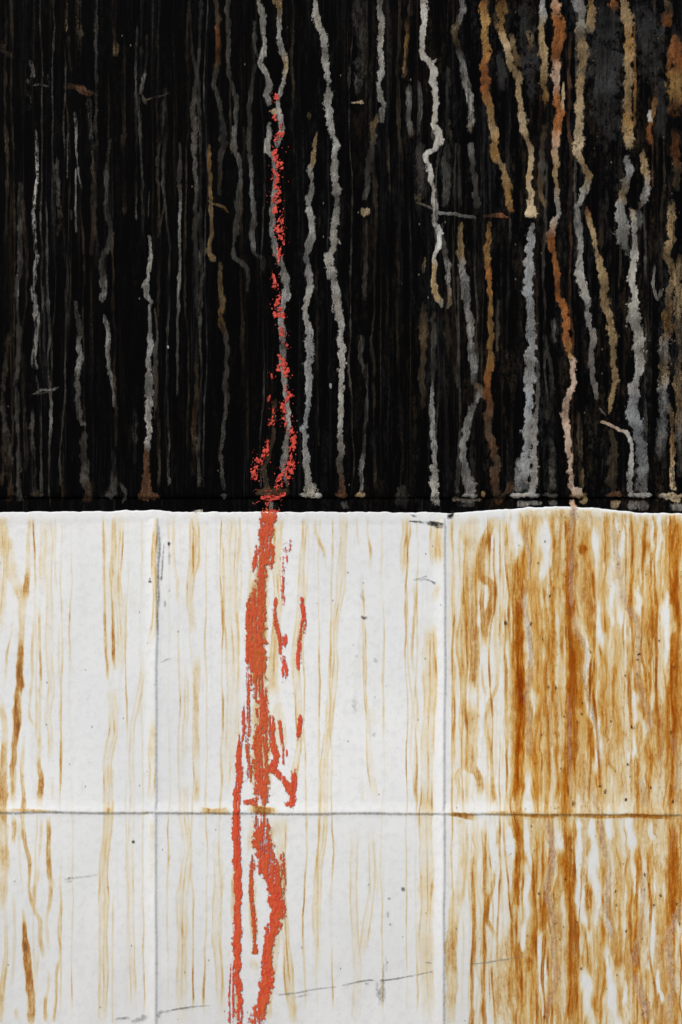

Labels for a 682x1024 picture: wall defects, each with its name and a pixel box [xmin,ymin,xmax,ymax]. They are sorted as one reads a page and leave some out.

damp [322,63,340,153]
damp [610,0,636,146]
rust [664,35,682,100]
damp [158,0,315,499]
damp [398,0,617,517]
damp [614,197,682,394]
damp [605,332,682,510]
rust [14,647,23,739]
rust [565,603,573,675]
rust [22,924,33,996]
rust [498,870,554,1022]
rust [557,906,588,970]